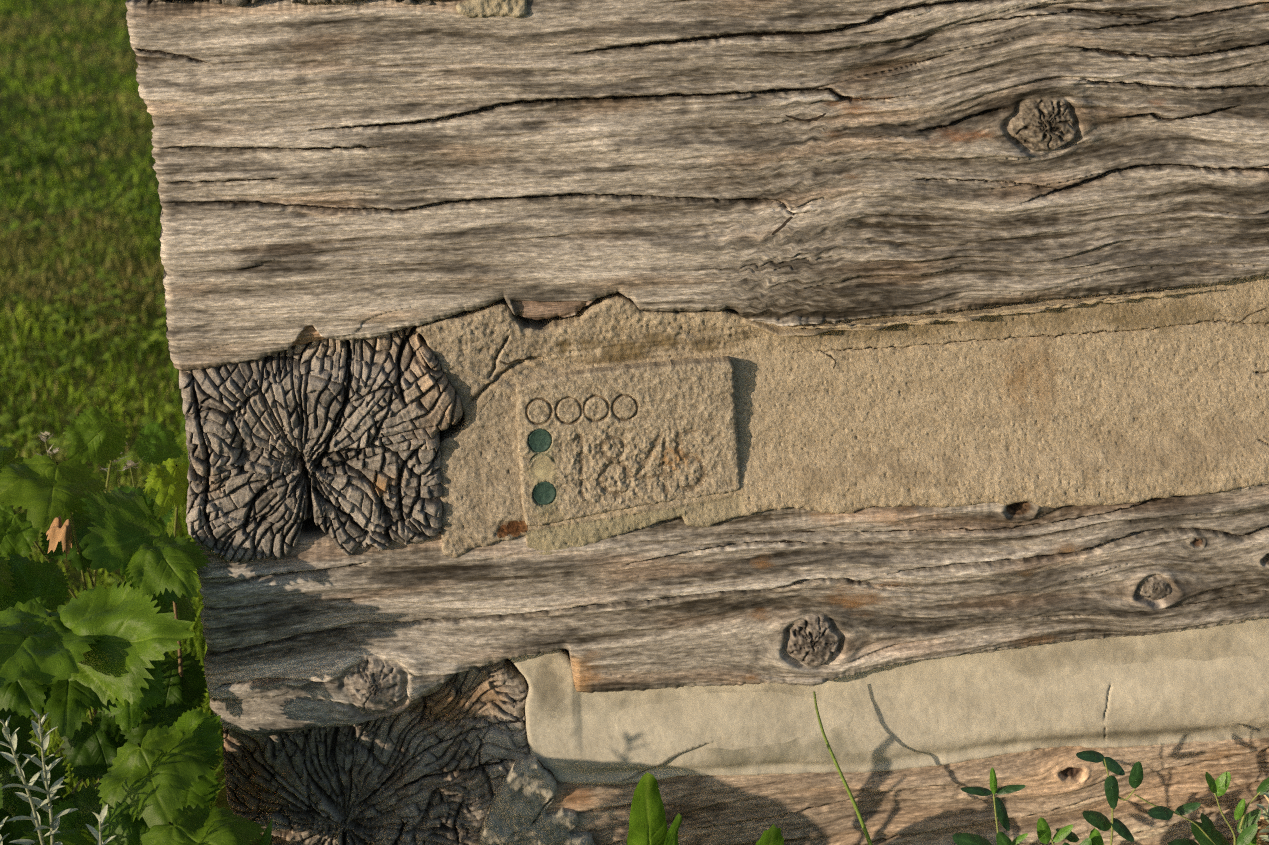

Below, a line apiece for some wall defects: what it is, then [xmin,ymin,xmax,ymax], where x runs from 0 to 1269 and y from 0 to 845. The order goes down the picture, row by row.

crack [783,308,1268,369]